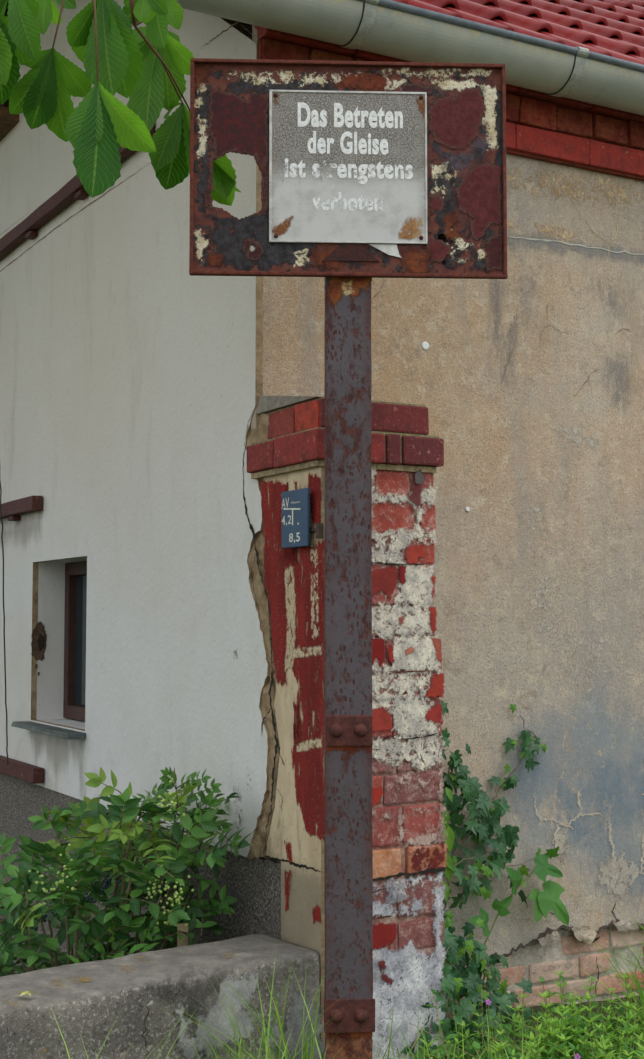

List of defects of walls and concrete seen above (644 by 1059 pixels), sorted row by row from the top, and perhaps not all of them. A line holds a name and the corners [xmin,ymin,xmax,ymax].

crack [243,414,321,872]
peeling [248,473,325,859]
peeling [372,469,448,876]
peeling [284,839,292,912]
peeling [312,905,321,924]
peeling [373,923,398,984]
flaking render [480,851,644,1008]